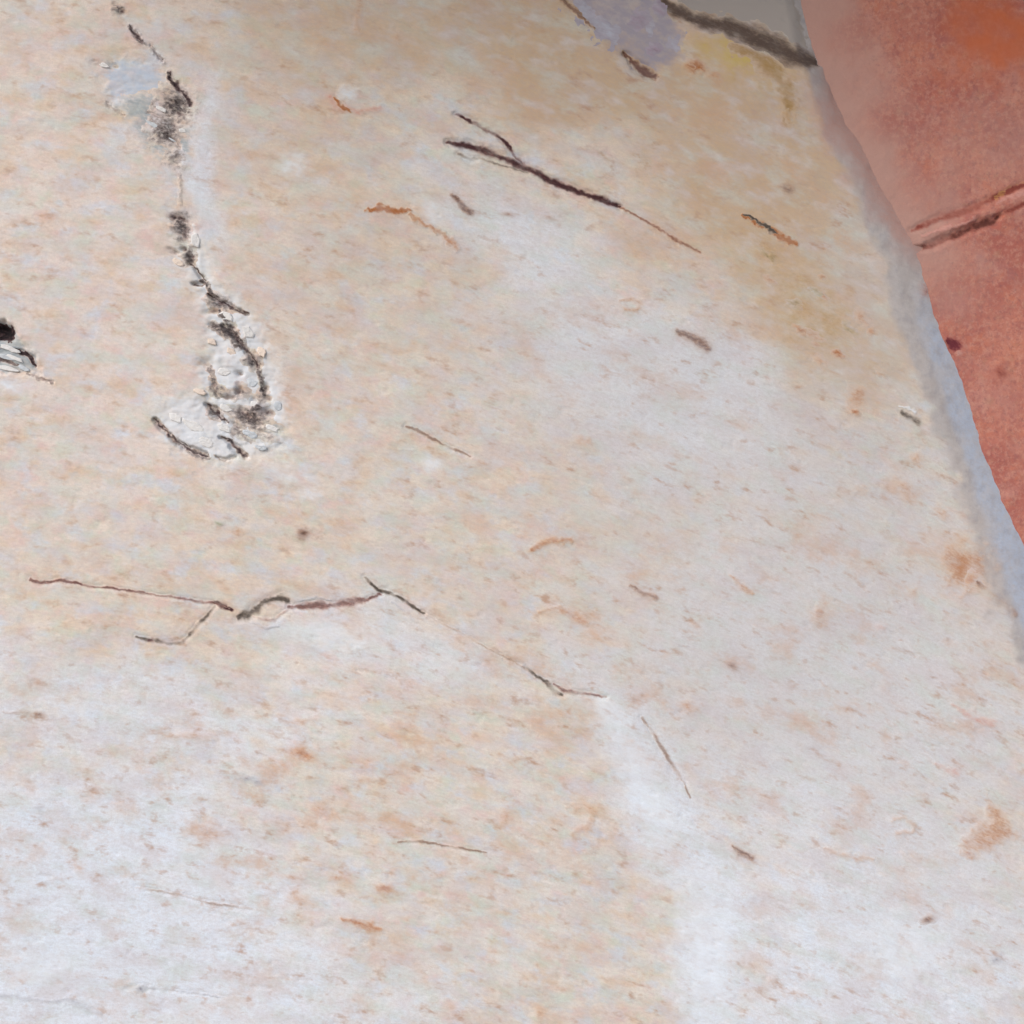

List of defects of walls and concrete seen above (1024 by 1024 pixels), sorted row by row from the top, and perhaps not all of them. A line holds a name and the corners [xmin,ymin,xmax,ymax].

flaking render [544,0,831,93]
crack [438,108,704,257]
flaking render [84,0,352,505]
flaking render [0,315,62,408]
crack [20,571,607,705]
crack [638,715,693,800]